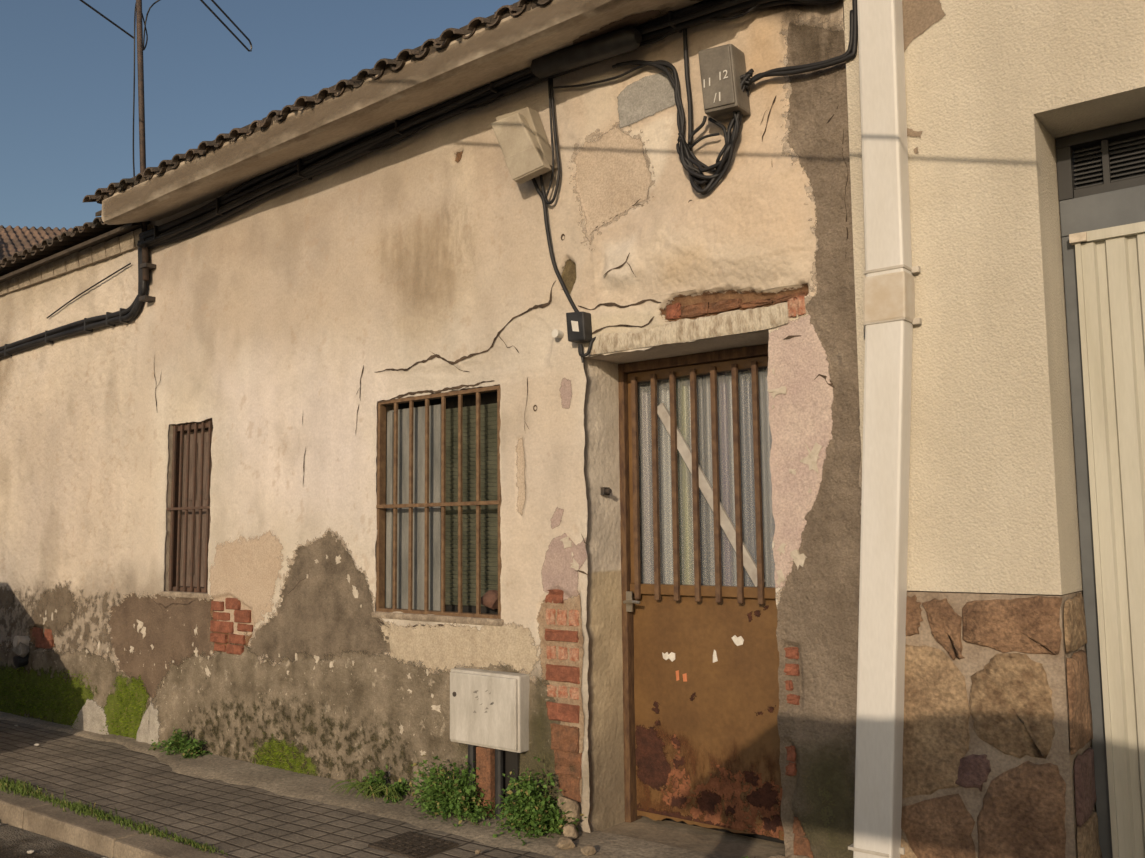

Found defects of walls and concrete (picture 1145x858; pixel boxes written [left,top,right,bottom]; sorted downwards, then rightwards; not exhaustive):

crack [355,277,564,435]
crack [579,253,665,334]
peeling [660,12,862,858]
water stain [0,581,120,658]
peeling [0,507,587,806]
rust [635,701,784,838]